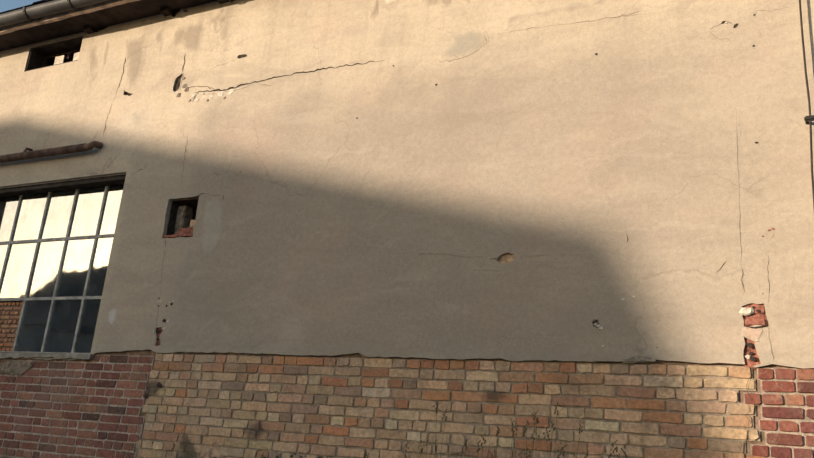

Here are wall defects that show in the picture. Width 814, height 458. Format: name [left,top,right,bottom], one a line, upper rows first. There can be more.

crack [182,56,383,100]
crack [716,116,745,292]
spalling [739,304,768,369]